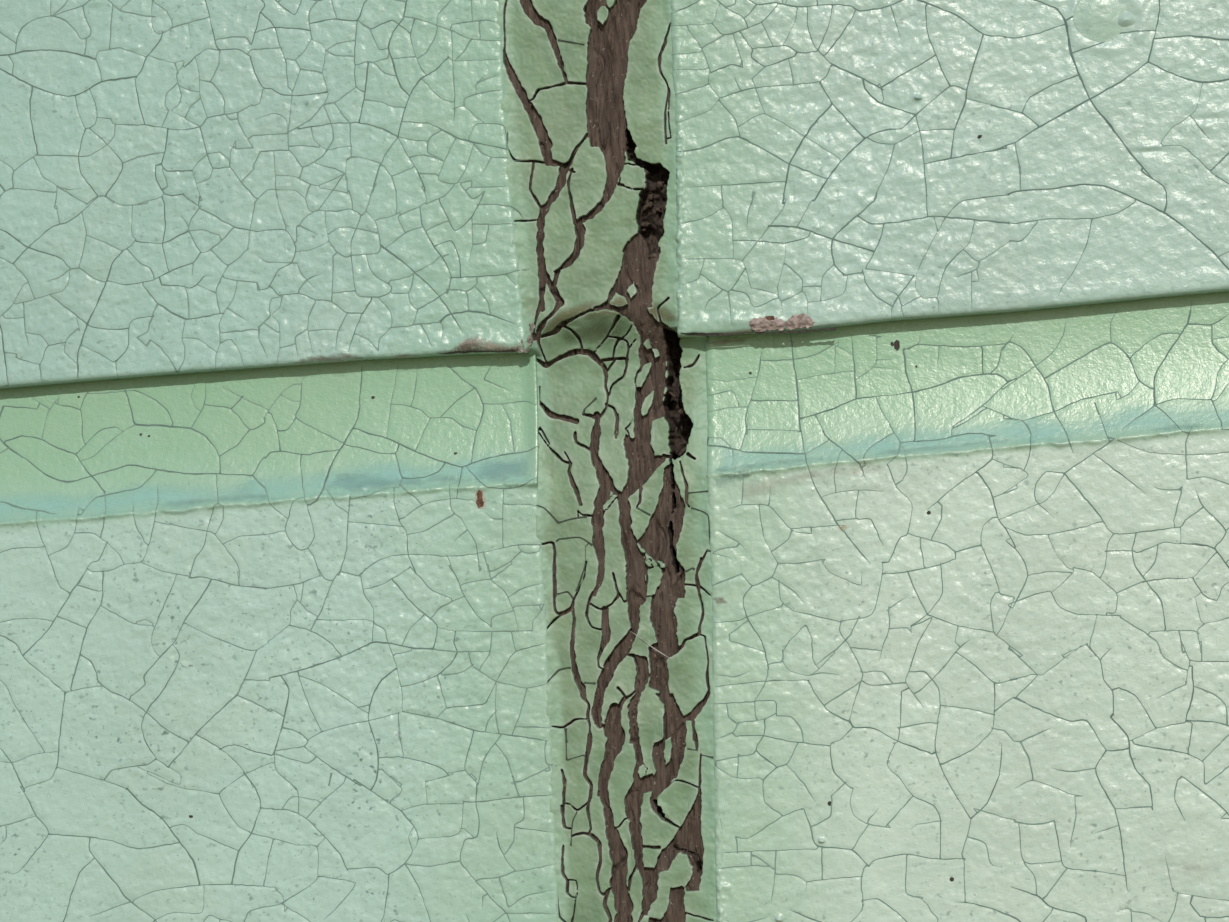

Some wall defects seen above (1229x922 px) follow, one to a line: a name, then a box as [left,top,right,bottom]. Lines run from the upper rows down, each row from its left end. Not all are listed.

crack [0,0,754,922]
peeling [497,0,717,922]
crack [658,0,1229,323]
crack [707,302,1229,922]